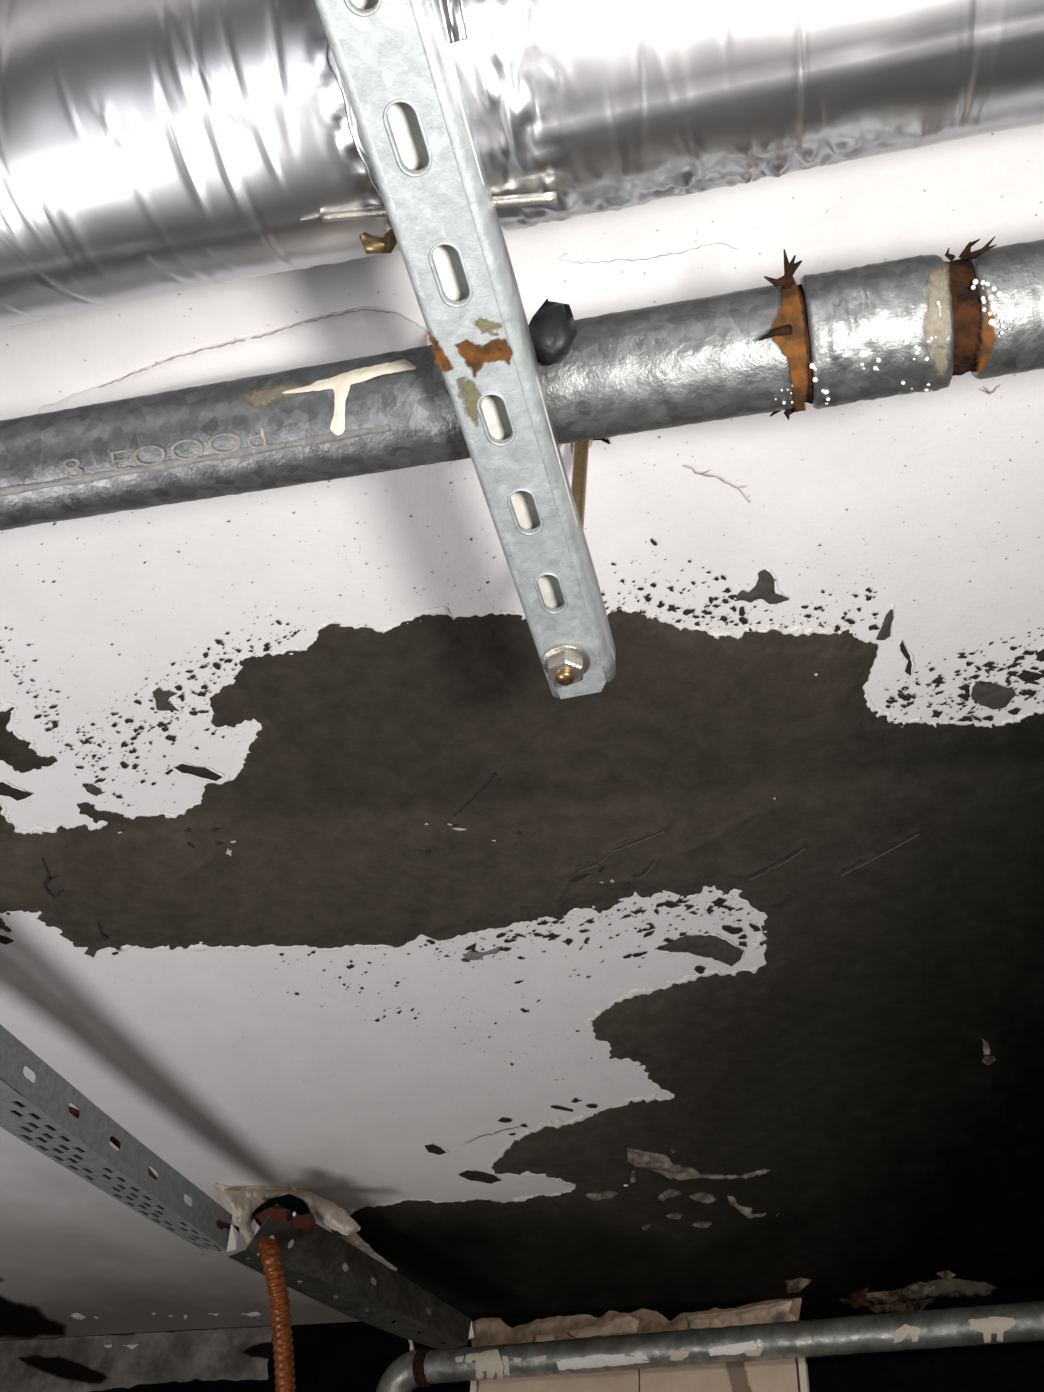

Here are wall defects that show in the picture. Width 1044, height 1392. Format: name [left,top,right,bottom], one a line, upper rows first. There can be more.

crack [683,465,750,502]
flaking render [0,539,1044,1347]